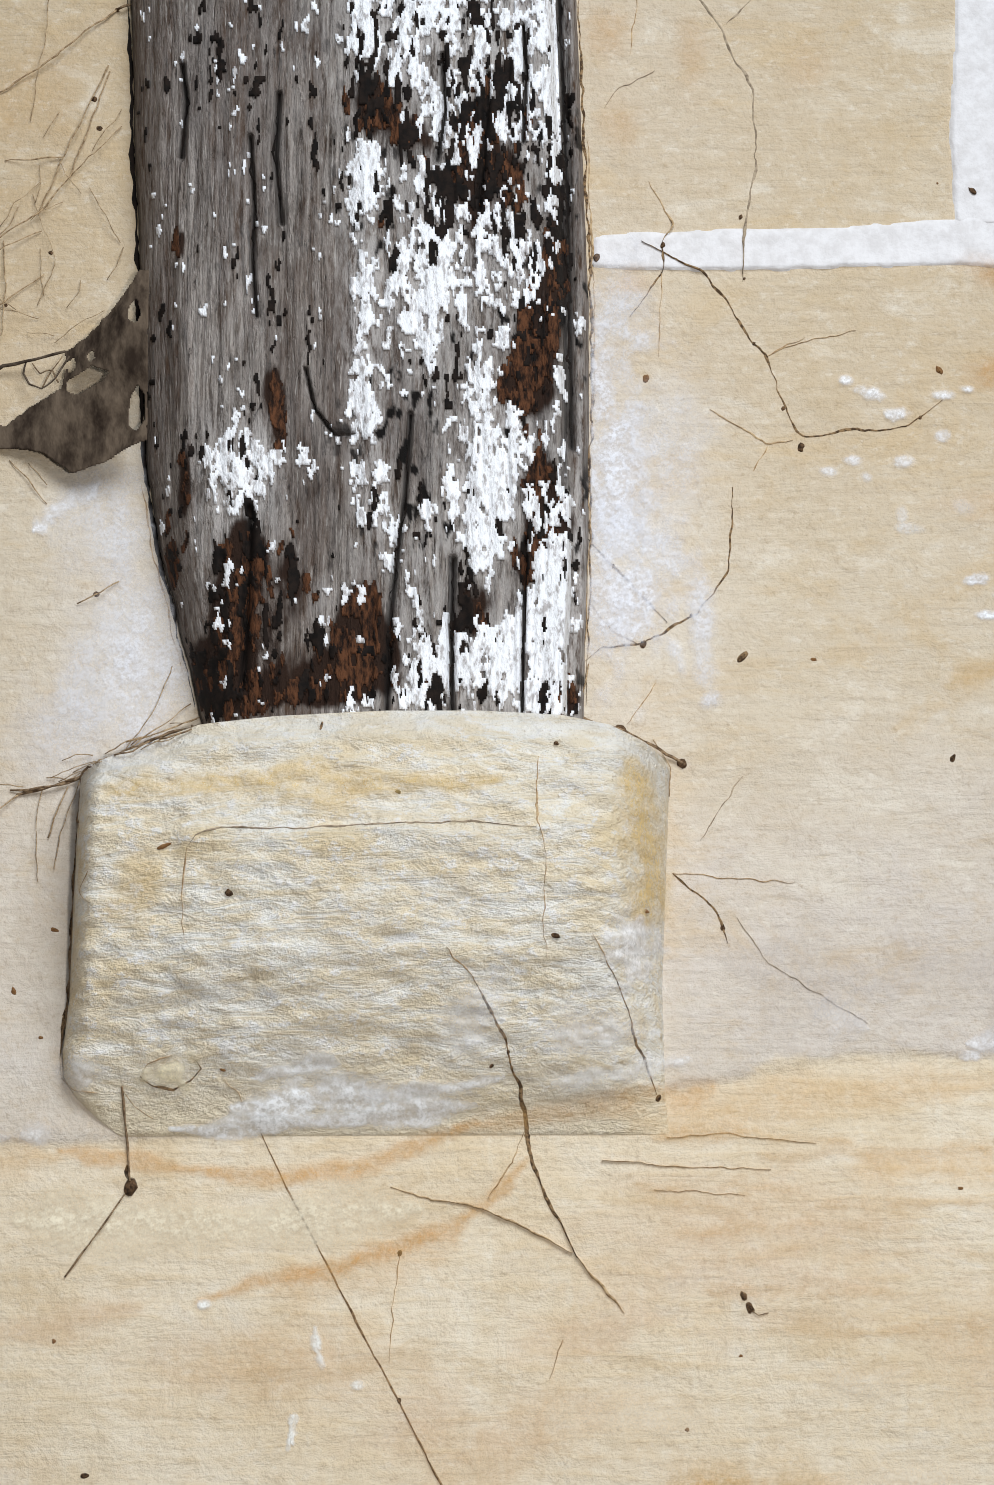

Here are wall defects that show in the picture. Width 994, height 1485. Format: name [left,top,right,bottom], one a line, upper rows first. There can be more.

crack [127,0,141,321]
peeling [301,0,319,34]
flaking render [103,612,180,735]
crack [139,387,195,707]
peeling [212,612,225,632]
peeling [221,558,234,589]
peeling [202,407,319,516]
peeling [341,0,677,716]
crack [520,567,528,704]
crack [522,0,942,703]
crack [225,1081,443,1485]
crack [391,948,623,1311]